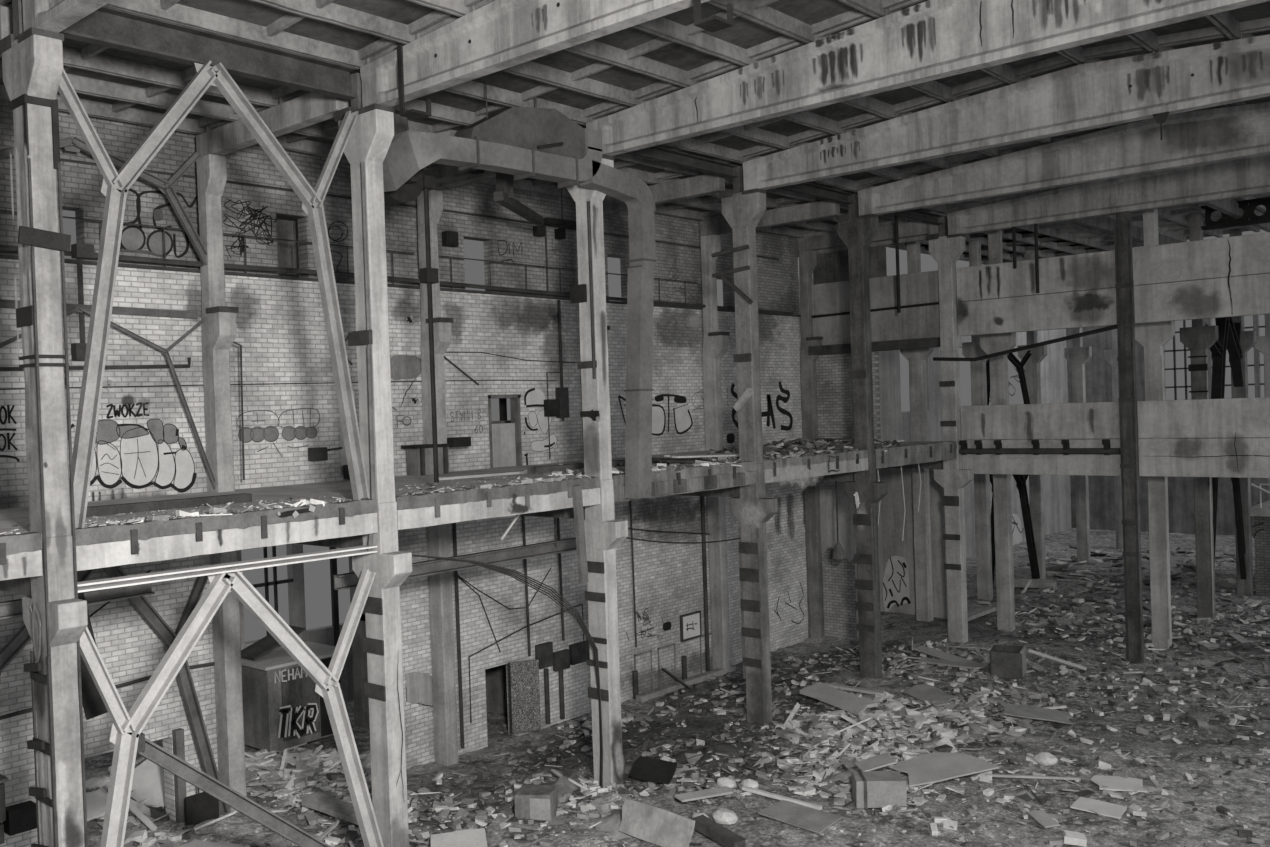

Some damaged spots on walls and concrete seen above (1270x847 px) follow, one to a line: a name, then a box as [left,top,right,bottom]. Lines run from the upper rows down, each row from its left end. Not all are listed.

leakage [902,1,936,59]
leakage [1033,0,1101,25]
leakage [813,29,862,97]
leakage [1128,52,1169,97]
leakage [1210,43,1227,84]
crack [1226,239,1234,311]